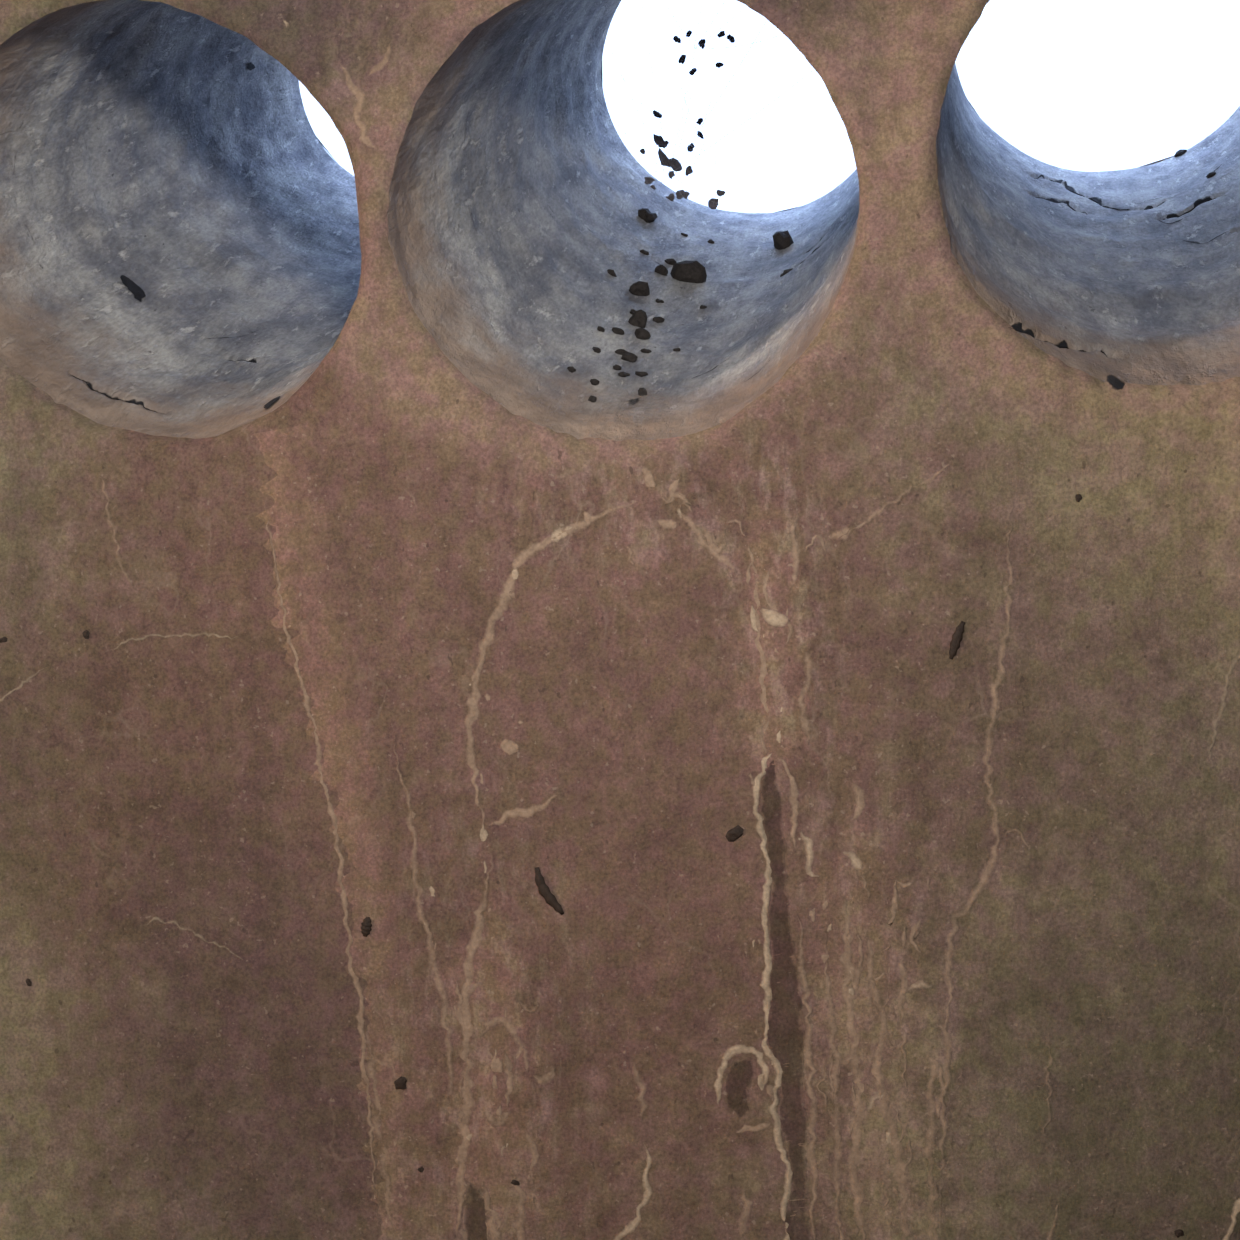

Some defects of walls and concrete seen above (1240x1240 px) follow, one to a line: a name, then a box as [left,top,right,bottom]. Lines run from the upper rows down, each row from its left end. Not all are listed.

water stain [714,781,997,1240]